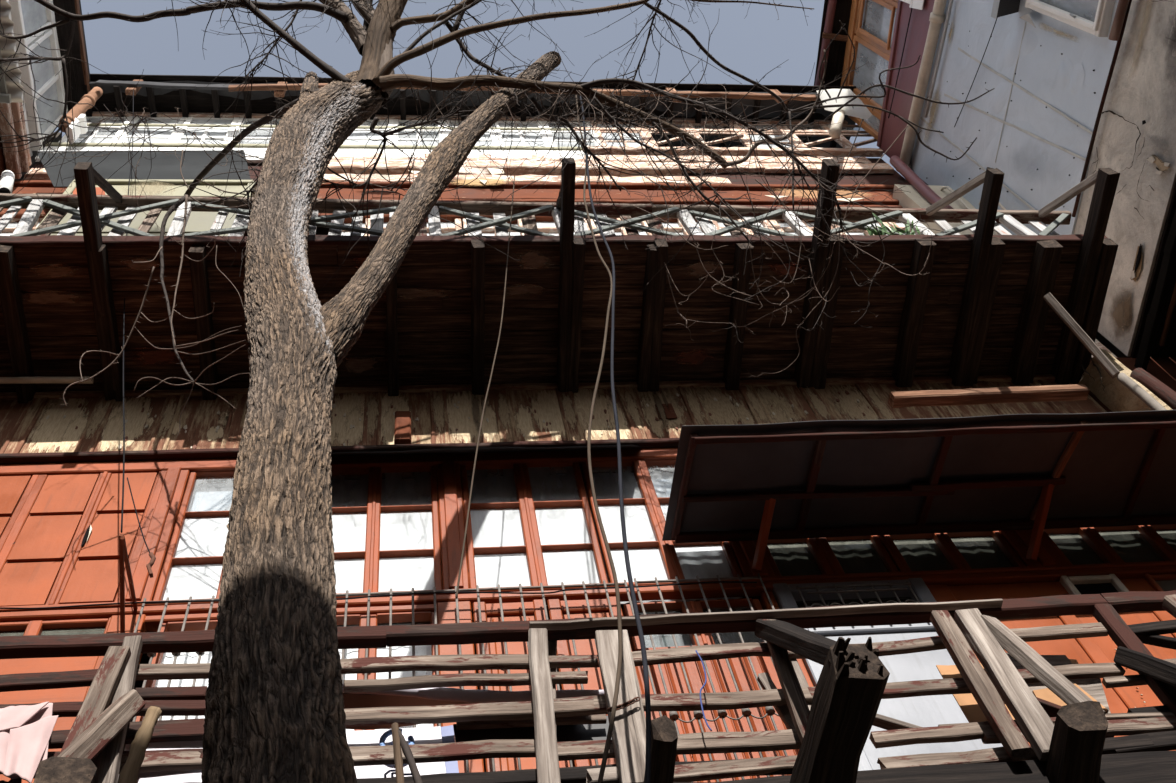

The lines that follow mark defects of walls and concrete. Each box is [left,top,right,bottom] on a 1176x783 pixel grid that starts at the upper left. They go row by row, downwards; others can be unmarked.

leakage [1167,21,1176,80]
crack [1081,110,1154,219]
peeling [26,397,187,453]
peeling [330,393,419,446]
peeling [432,384,893,443]